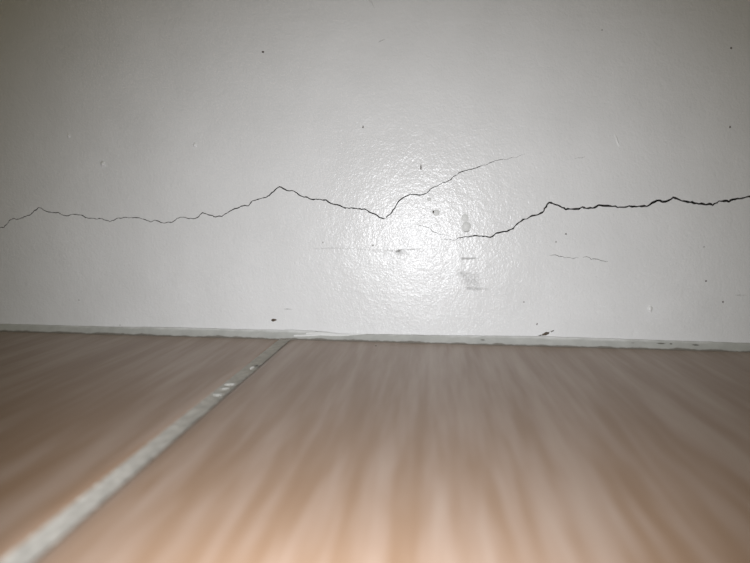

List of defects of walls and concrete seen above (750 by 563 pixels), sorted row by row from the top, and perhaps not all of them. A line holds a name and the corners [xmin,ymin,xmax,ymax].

crack [0,157,516,228]
crack [416,196,750,240]